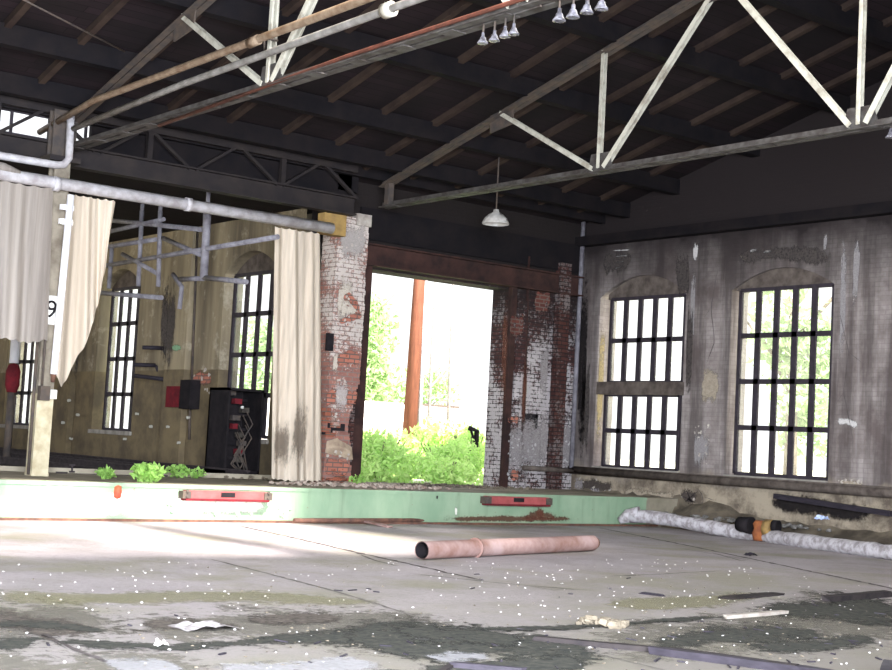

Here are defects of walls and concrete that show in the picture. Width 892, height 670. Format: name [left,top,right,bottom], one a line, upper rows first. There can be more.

spalling [534,291,550,315]
spalling [321,350,360,437]
crack [22,625,121,670]
damp [0,589,892,670]